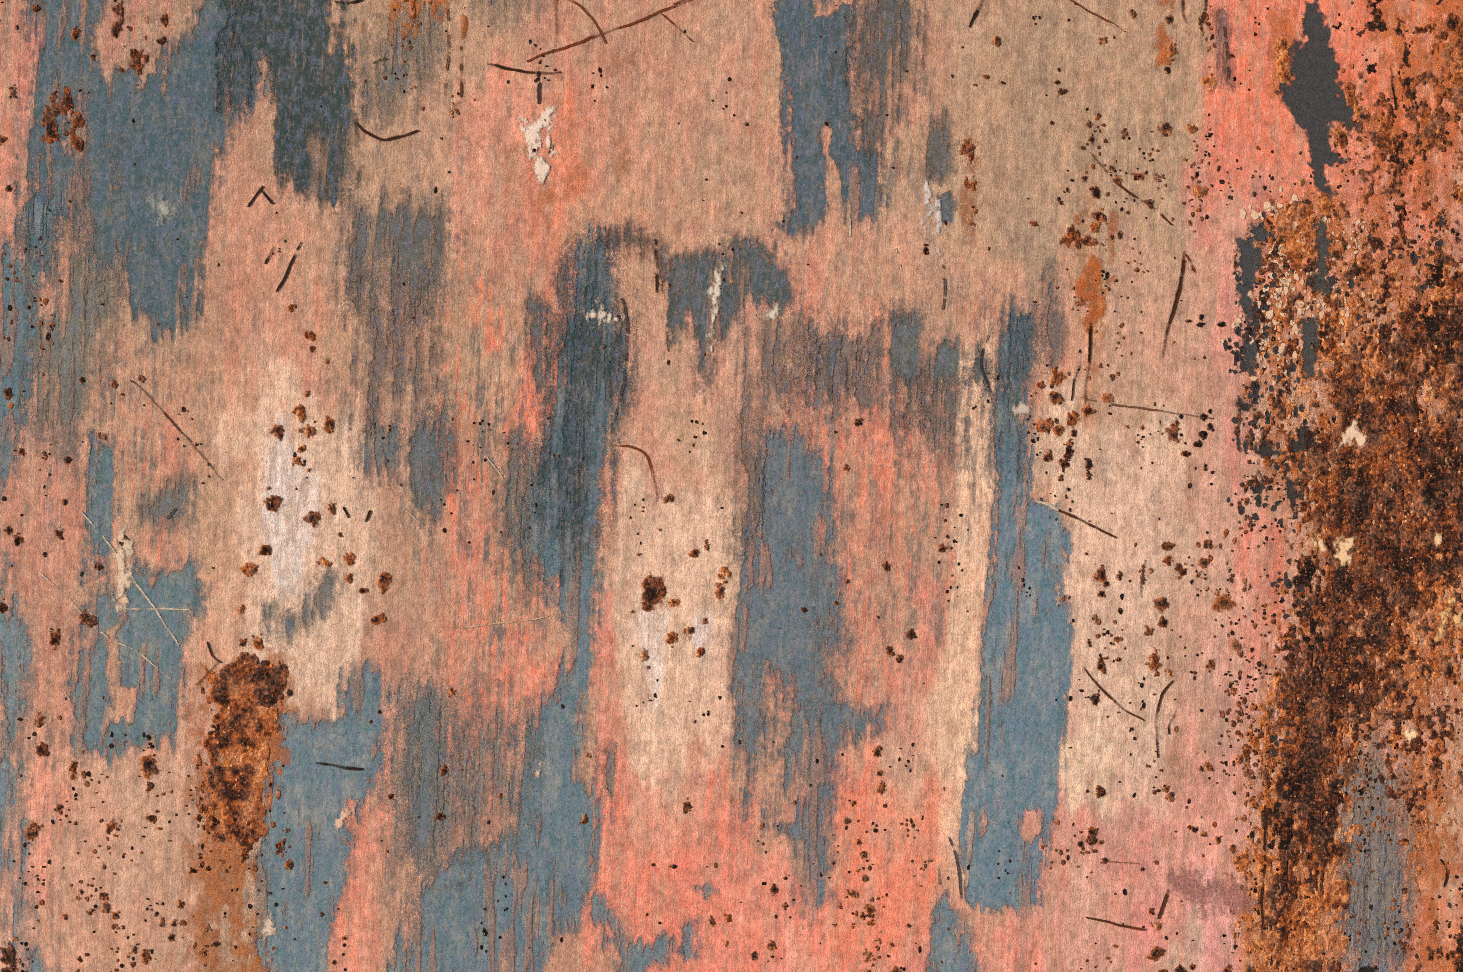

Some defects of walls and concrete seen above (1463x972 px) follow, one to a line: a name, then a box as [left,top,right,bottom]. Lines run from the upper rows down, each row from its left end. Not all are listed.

rust [389,0,468,88]
rust [18,444,72,476]
rust [1084,0,1463,972]
rust [4,526,23,546]
rust [49,627,60,650]
rust [78,609,97,628]
rust [34,712,61,757]
rust [24,804,77,841]
rust [140,755,172,842]
rust [159,633,294,972]
rust [62,750,156,972]
rust [1041,826,1108,878]